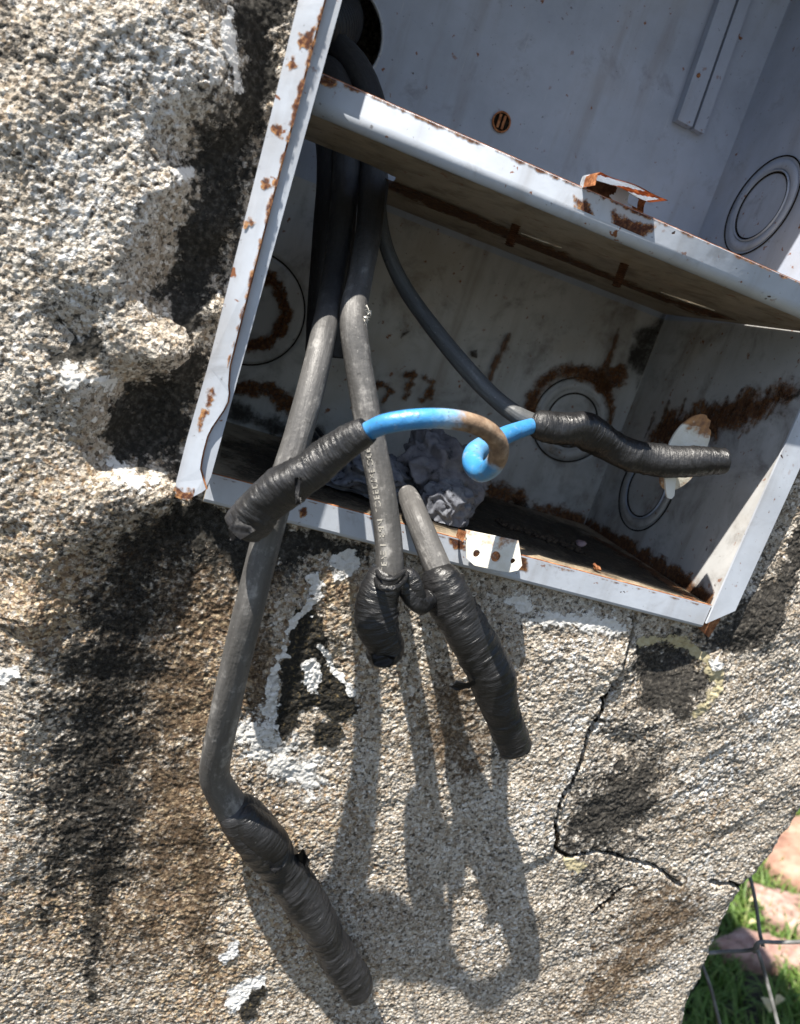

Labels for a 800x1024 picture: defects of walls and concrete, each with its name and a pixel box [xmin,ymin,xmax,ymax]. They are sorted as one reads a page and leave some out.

damp [146,0,297,480]
damp [241,524,373,727]
damp [15,496,250,1004]
crack [553,684,677,913]
damp [561,735,687,857]